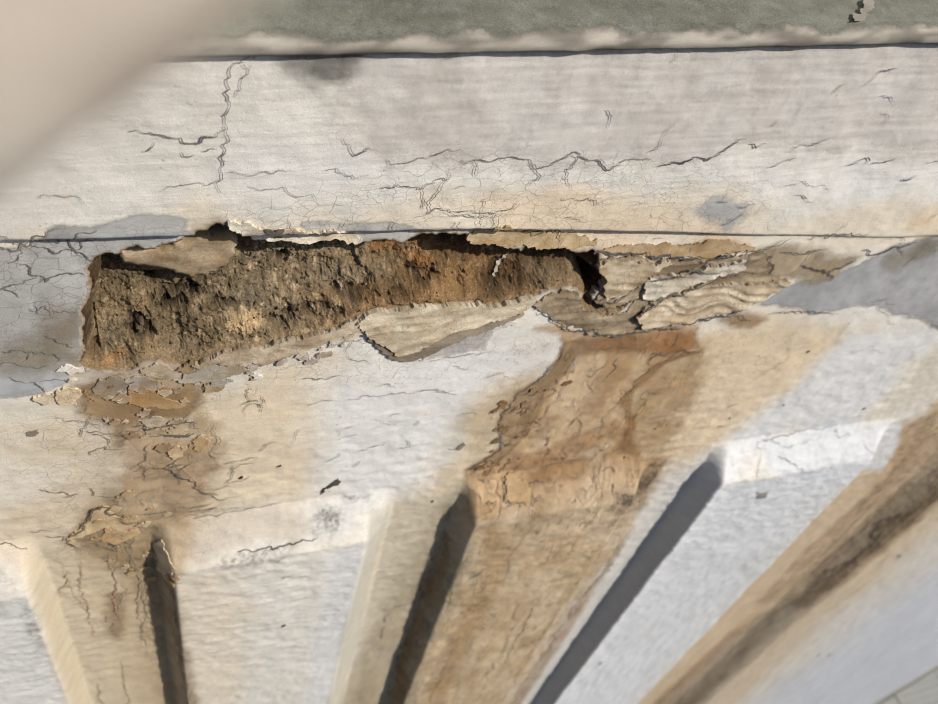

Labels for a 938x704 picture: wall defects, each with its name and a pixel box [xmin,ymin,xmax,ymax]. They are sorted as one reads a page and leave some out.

crack [129,56,317,201]
crack [326,119,779,245]
crack [849,157,937,181]
crack [305,339,455,468]
spalling [0,196,938,460]
damp [617,348,705,461]
crack [467,201,937,507]
peeling [67,490,173,548]
peeling [107,539,180,588]
crack [0,412,300,703]
crack [238,538,317,553]
damp [764,416,938,606]